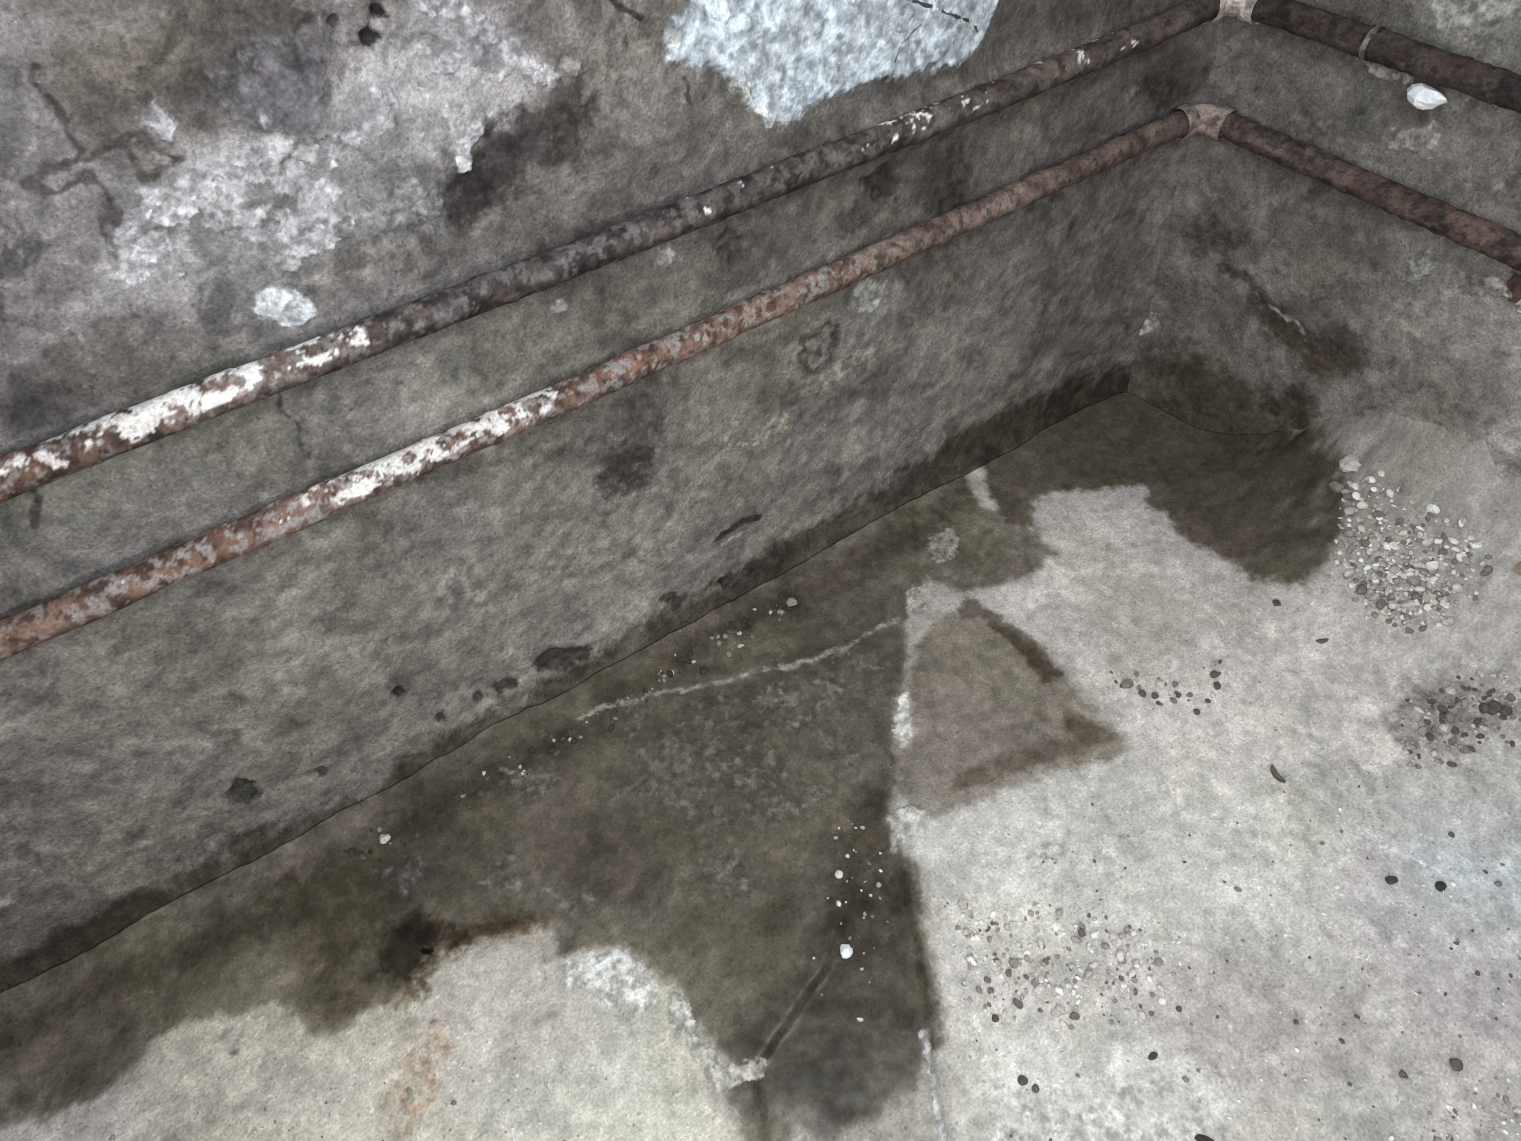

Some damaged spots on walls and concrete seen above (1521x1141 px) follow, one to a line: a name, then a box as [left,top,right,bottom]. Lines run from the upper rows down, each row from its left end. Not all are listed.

flaking render [358,3,387,46]
peeling [665,0,999,128]
peeling [1422,0,1521,32]
peeling [455,122,485,173]
water stain [595,378,667,500]
water stain [985,392,1342,581]
flaking render [533,646,593,671]
water stain [350,708,641,953]
water stain [560,538,920,1092]
peeling [887,805,927,851]
crack [919,1029,947,1141]
water stain [990,1076,1228,1141]